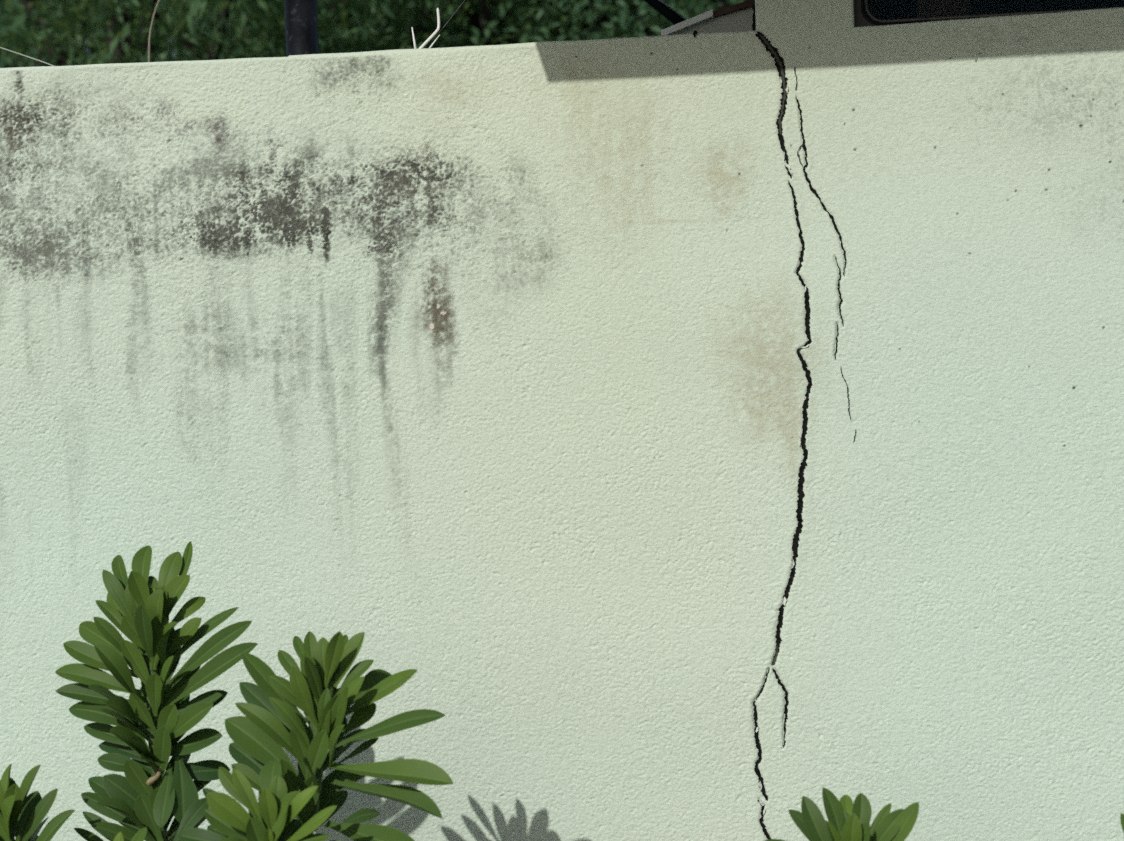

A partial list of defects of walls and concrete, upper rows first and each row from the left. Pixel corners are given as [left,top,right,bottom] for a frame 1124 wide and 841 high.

mould [0,71,64,144]
mould [0,220,109,276]
mould [92,155,452,260]
crack [752,0,856,840]